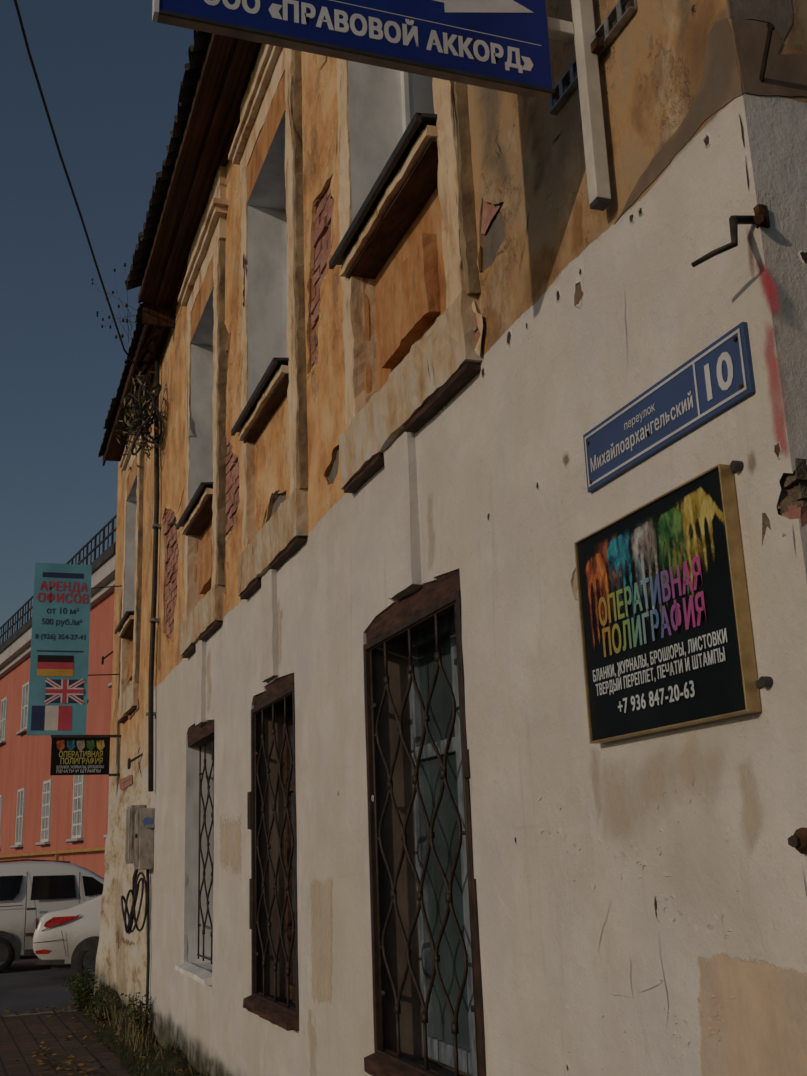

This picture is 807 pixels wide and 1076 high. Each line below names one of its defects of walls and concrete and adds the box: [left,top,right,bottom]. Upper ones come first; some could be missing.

peeling [614,0,807,225]
spalling [306,171,336,380]
spalling [477,192,512,286]
spalling [225,322,241,595]
spalling [773,442,783,461]
spalling [762,458,807,545]
spalling [163,504,179,643]
crack [621,944,669,1026]